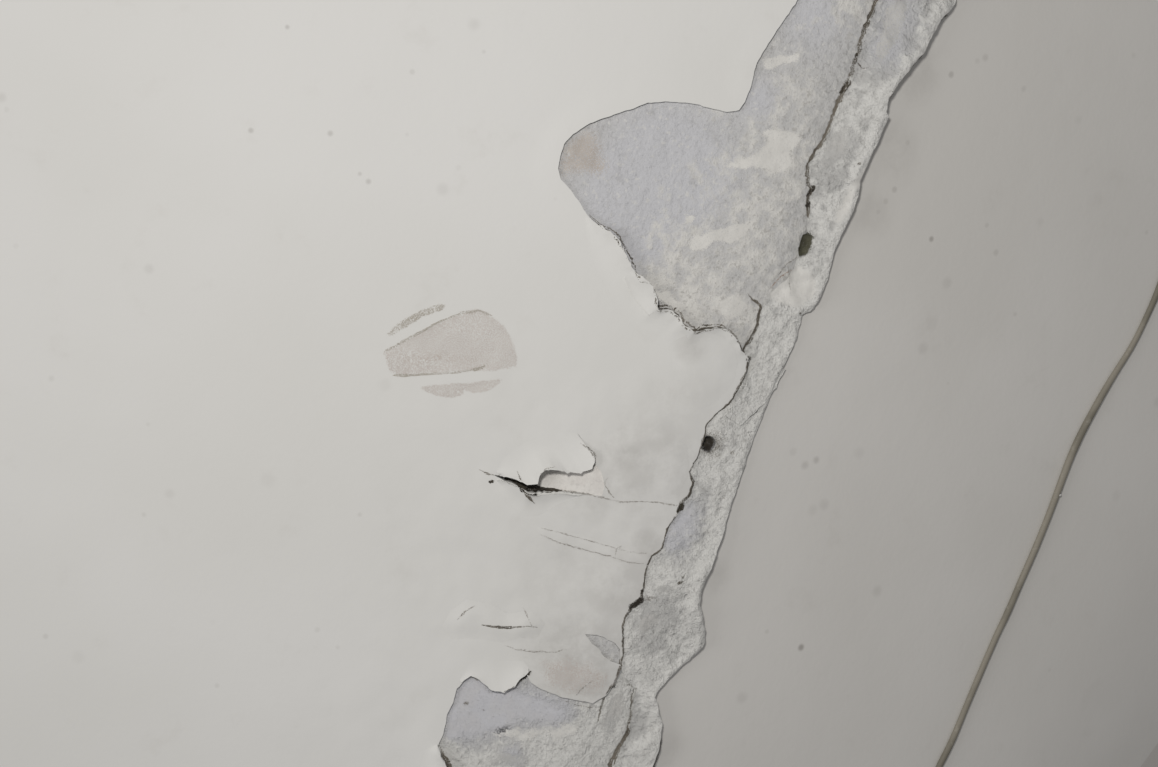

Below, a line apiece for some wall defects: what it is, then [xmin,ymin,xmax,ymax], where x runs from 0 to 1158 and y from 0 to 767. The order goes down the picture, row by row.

damp [383,304,517,398]
crack [566,257,797,767]
spalling [420,0,956,767]
crack [805,0,878,218]